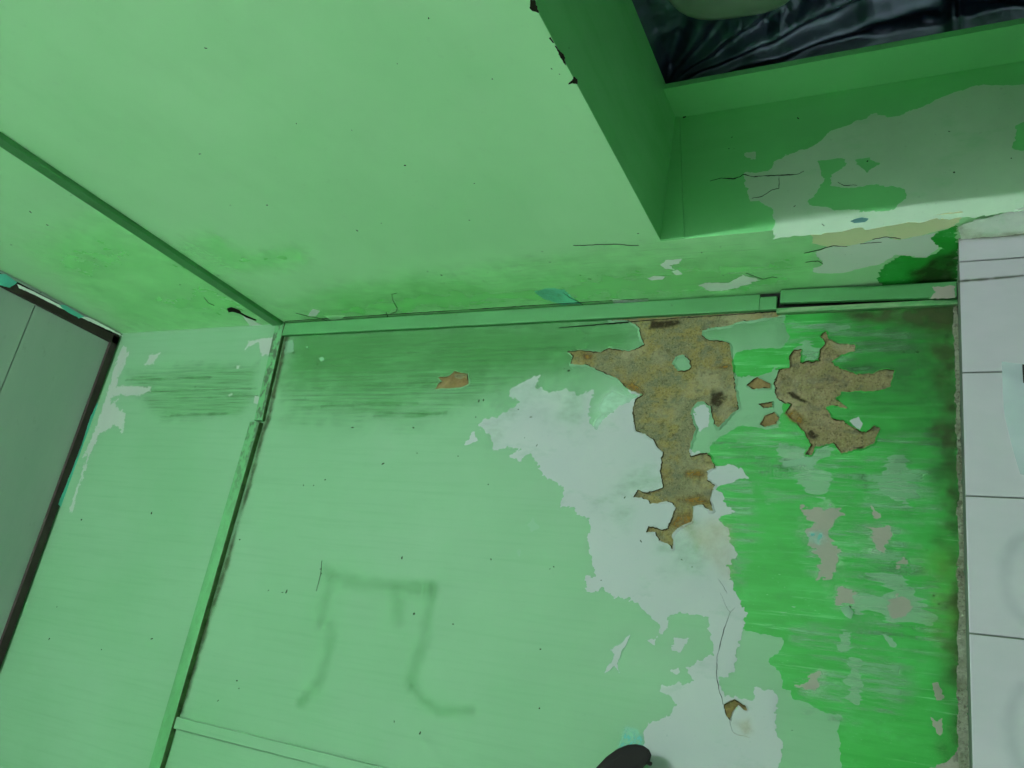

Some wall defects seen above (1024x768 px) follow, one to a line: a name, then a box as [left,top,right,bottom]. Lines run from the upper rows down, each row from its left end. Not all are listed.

crack [711,171,804,198]
peeling [0,274,151,513]
spalling [435,370,470,391]
peeling [464,84,1024,768]